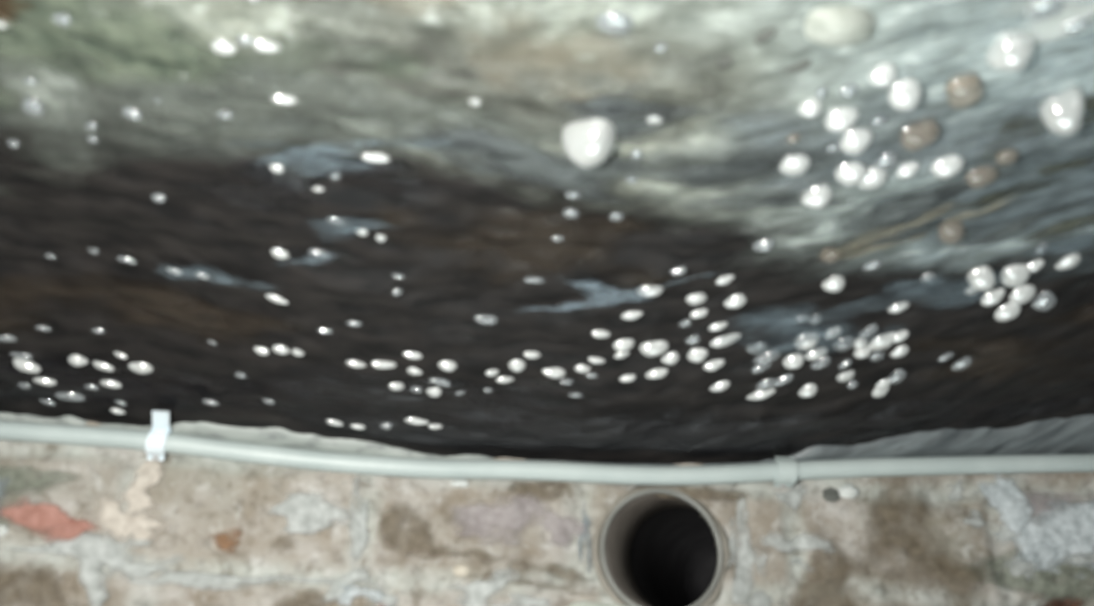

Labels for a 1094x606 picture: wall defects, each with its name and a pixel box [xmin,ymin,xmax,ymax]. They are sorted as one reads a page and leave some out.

leakage [0,0,1094,464]